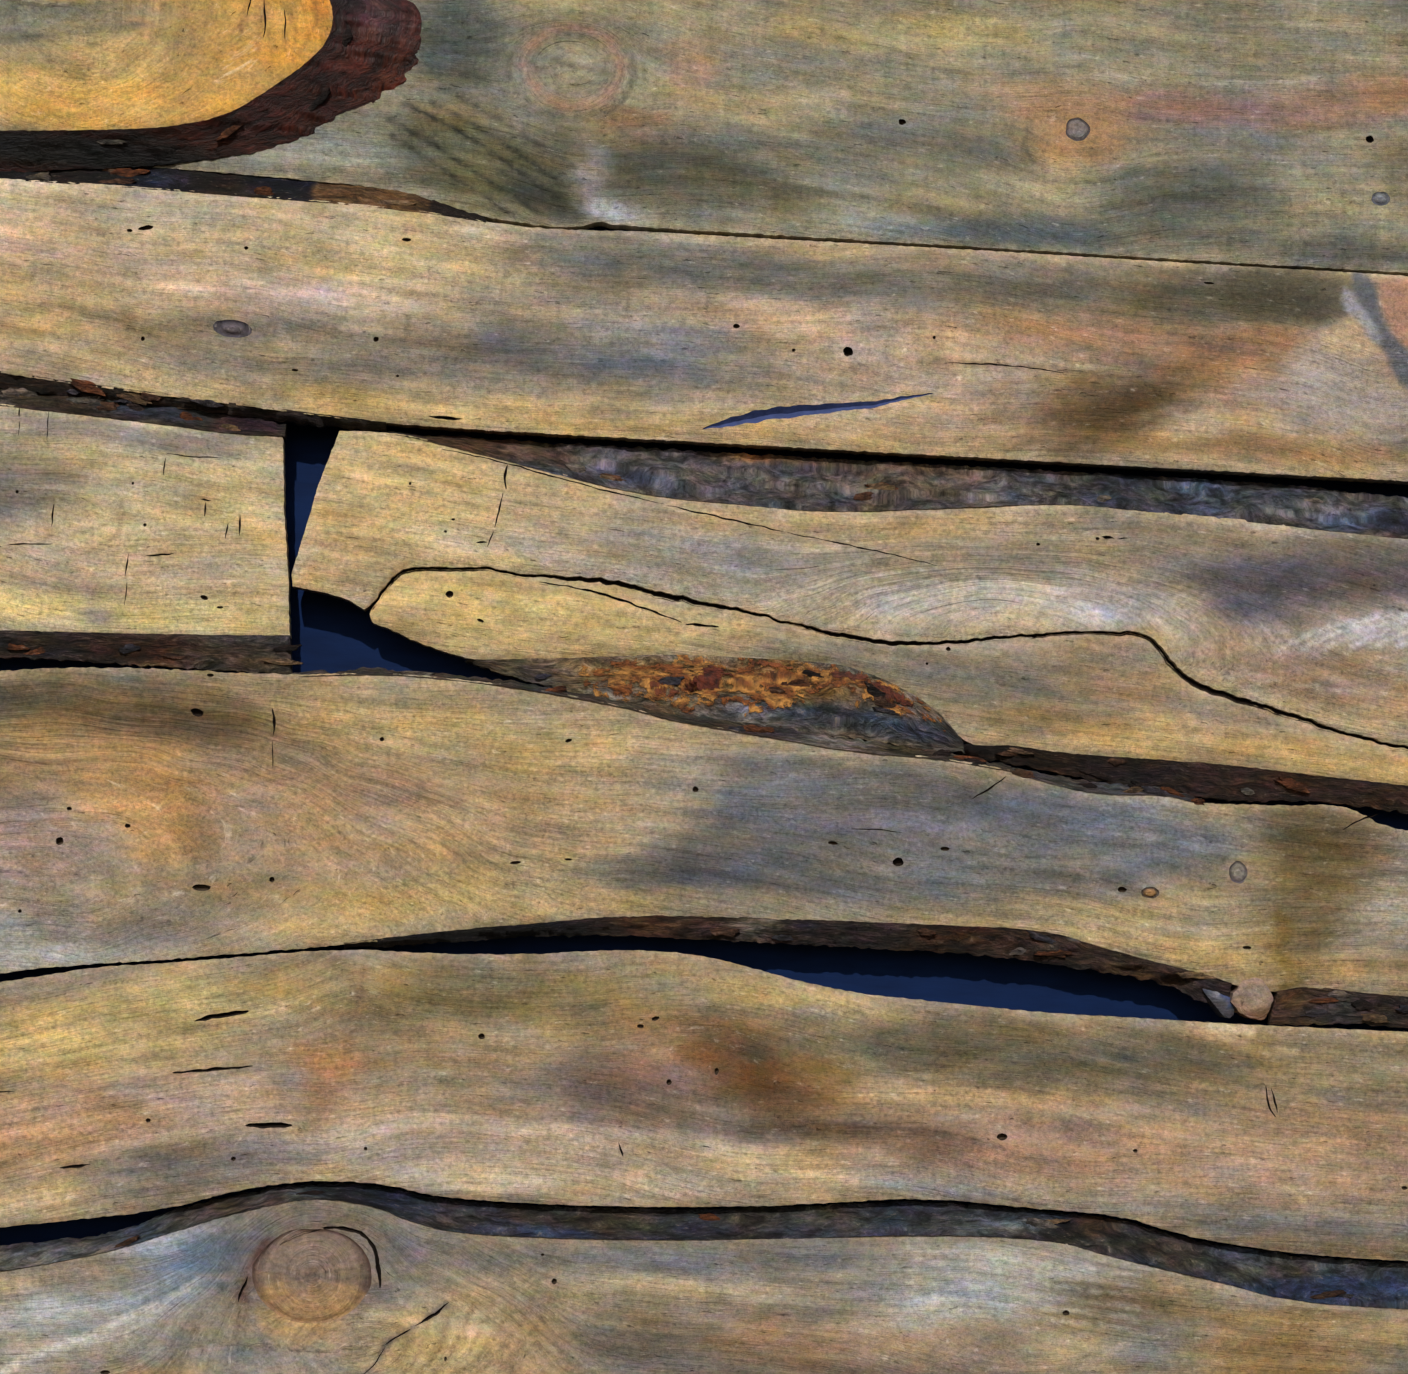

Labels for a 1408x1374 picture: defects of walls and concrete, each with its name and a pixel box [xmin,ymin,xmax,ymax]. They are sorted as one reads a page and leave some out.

crack [952,362,1063,373]
crack [703,393,933,429]
crack [369,416,1408,751]